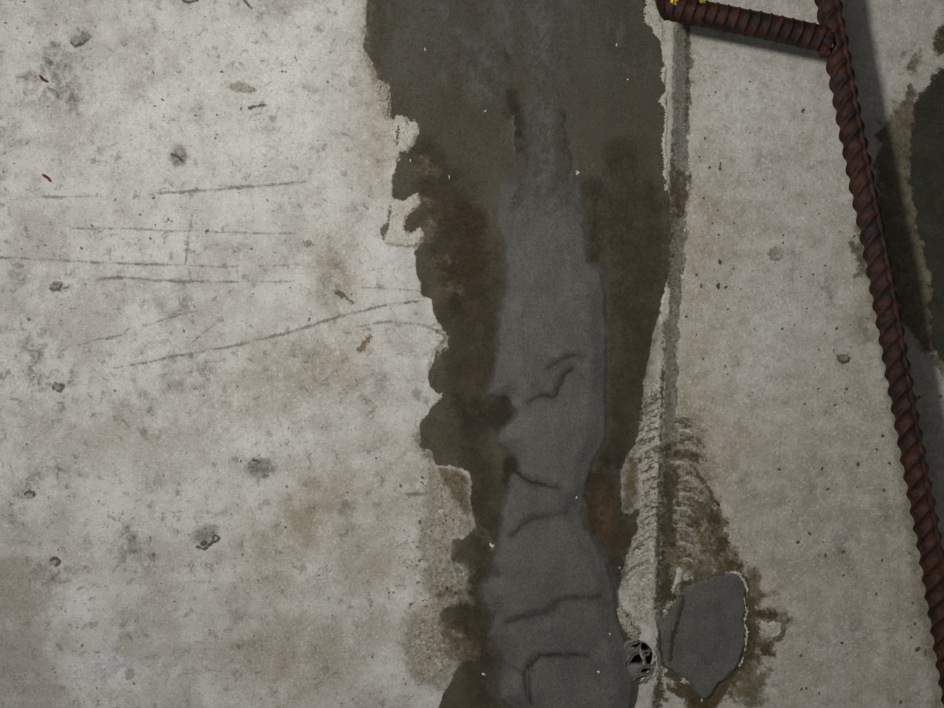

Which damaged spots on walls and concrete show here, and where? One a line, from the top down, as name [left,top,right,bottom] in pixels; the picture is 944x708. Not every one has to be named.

water stain [933,25,944,55]
water stain [364,0,675,708]
rust [849,225,866,278]
water stain [874,68,944,374]
water stain [658,498,790,708]